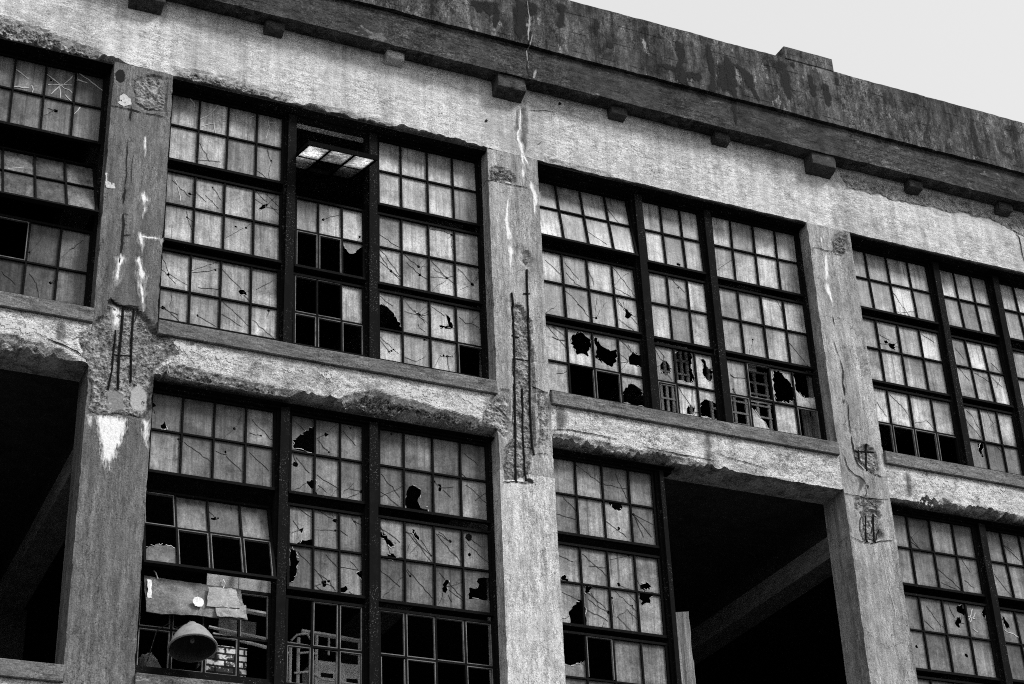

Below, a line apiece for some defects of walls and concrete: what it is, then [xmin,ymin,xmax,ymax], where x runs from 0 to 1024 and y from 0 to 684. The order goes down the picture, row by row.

damp [658,41,760,123]
damp [776,61,795,100]
damp [808,75,839,107]
spalling [0,304,293,417]
spalling [343,255,549,483]
spalling [855,443,877,473]
peeling [929,476,953,489]
spalling [855,498,880,543]